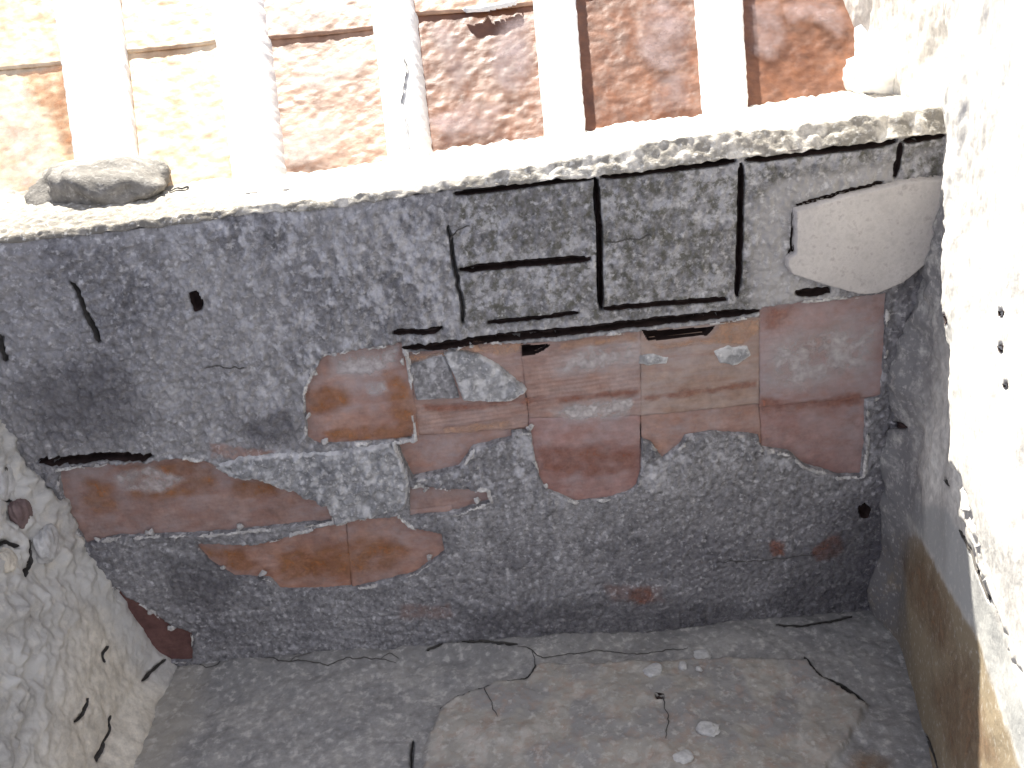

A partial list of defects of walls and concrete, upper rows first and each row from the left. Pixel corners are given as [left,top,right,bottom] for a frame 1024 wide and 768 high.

crack [448,226,467,322]
crack [70,282,101,343]
flaking render [400,348,420,390]
flaking render [55,464,107,486]
flaking render [392,416,418,462]
flaking render [760,434,870,481]
flaking render [75,506,364,543]
flaking render [453,487,494,517]
crack [141,659,166,681]
crack [427,639,686,717]
crack [804,657,865,702]
crack [74,698,111,762]